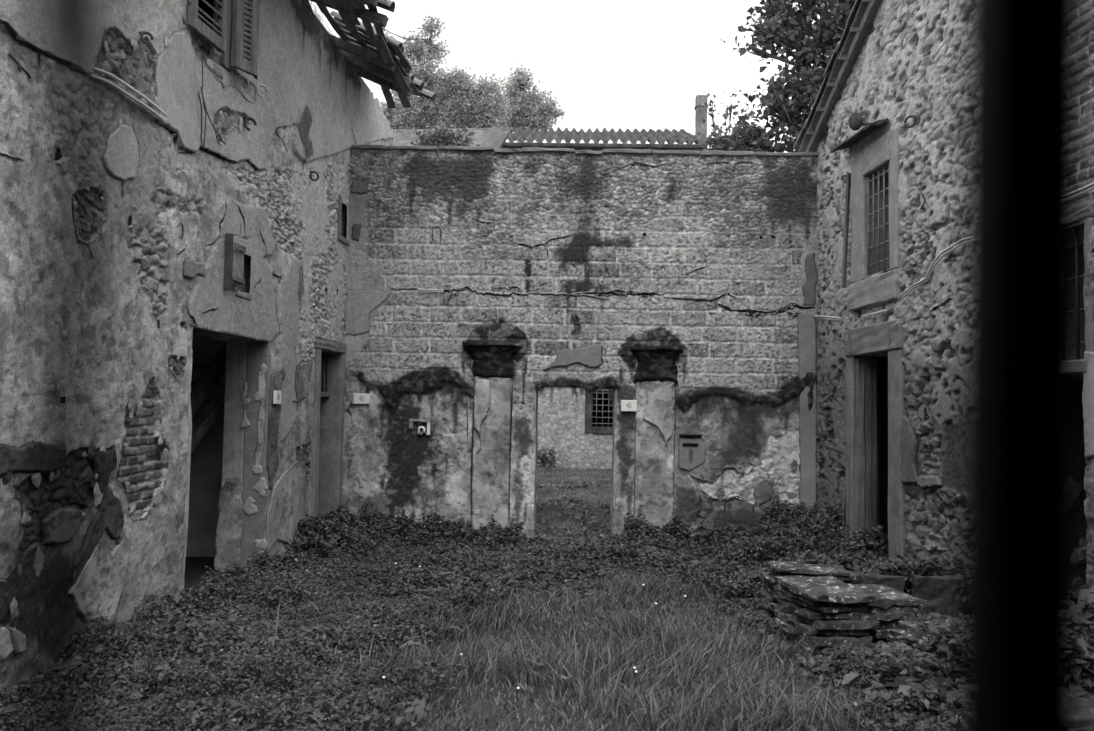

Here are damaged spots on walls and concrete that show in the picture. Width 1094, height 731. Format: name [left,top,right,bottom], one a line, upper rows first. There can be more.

water stain [404,155,493,223]
water stain [556,156,630,300]
crack [391,266,816,318]
water stain [763,160,818,240]
spalling [168,354,187,382]
spalling [91,376,169,554]
water stain [359,385,466,525]
peeling [0,441,36,655]